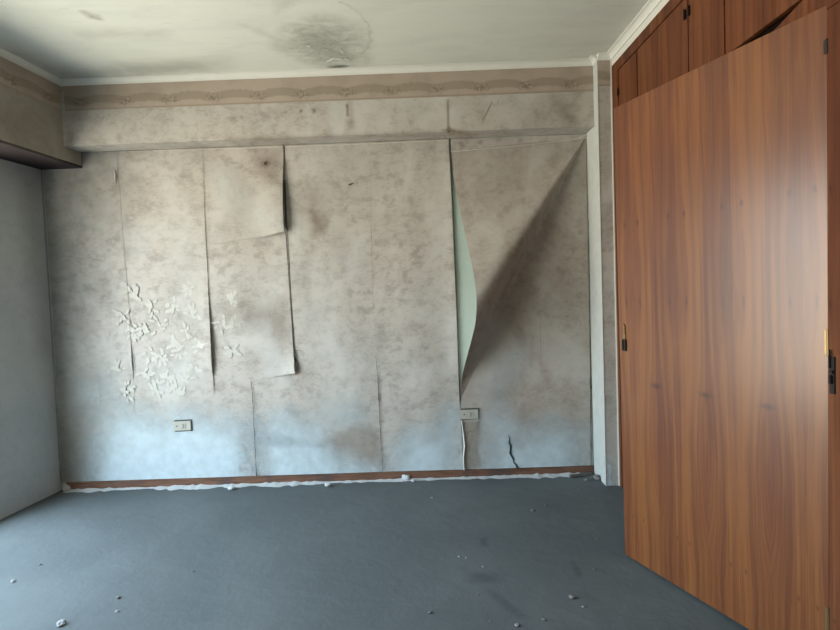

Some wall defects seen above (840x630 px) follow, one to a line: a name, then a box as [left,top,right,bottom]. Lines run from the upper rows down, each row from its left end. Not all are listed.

crack [508,435,518,468]